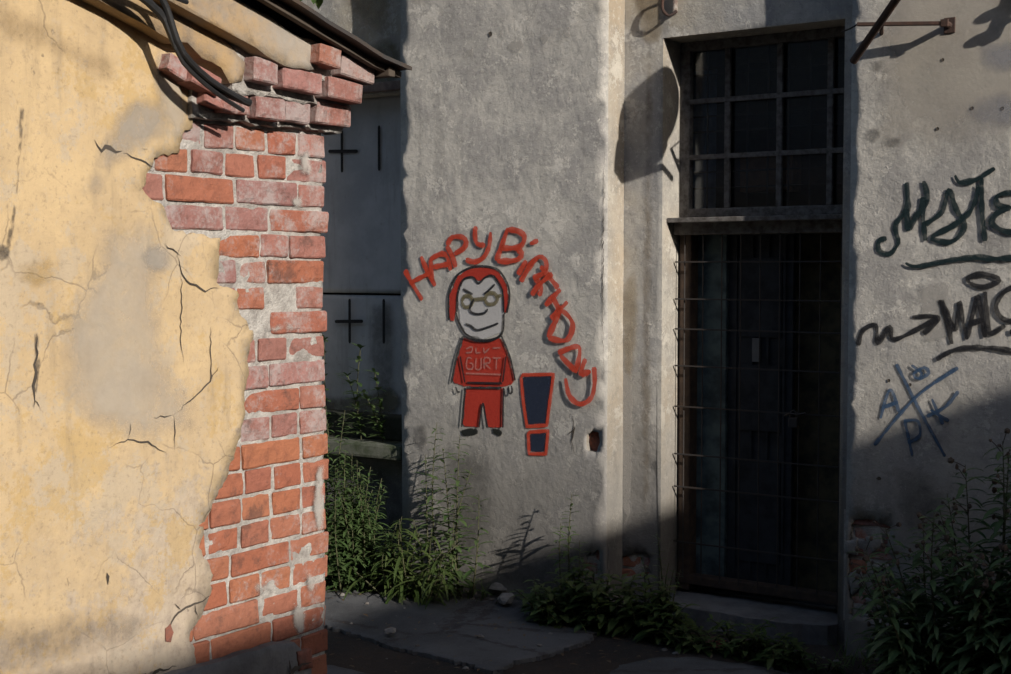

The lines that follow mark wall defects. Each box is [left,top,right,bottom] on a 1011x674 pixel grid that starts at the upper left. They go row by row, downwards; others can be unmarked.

crack [32,344,40,407]
crack [112,334,218,452]
crack [165,244,216,363]
flaking render [142,43,375,674]
flaking render [589,431,600,451]
crack [165,595,211,642]